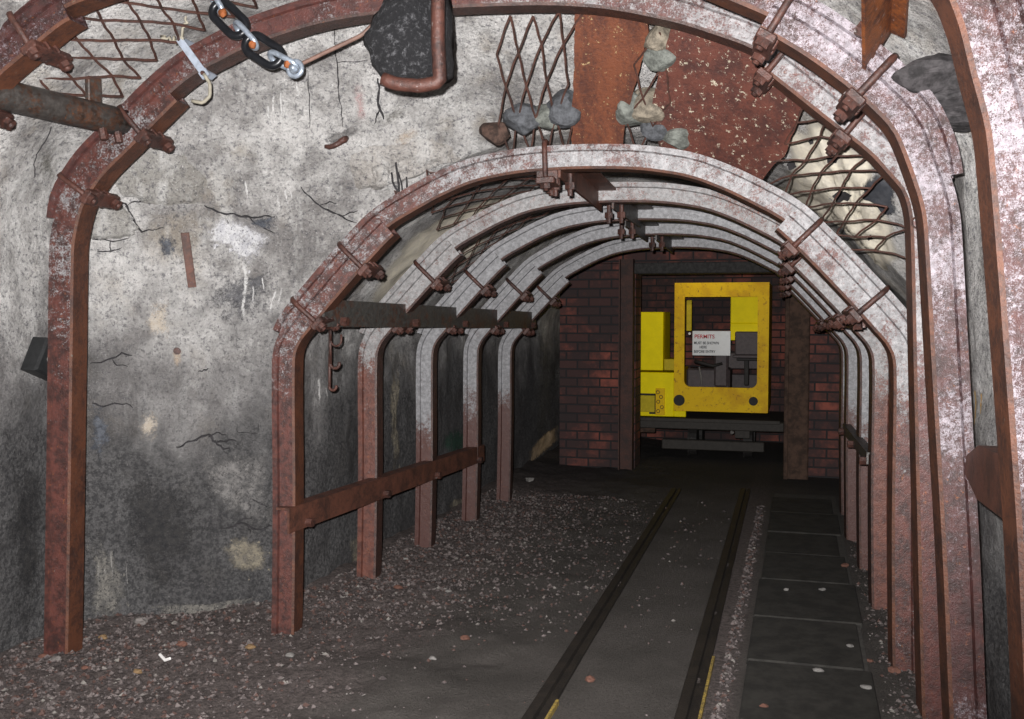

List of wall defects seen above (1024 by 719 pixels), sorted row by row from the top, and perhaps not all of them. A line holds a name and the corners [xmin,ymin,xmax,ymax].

crack [92,201,163,252]
crack [204,205,275,233]
crack [301,187,357,223]
crack [92,352,132,367]
crack [92,401,133,409]
crack [176,424,272,533]